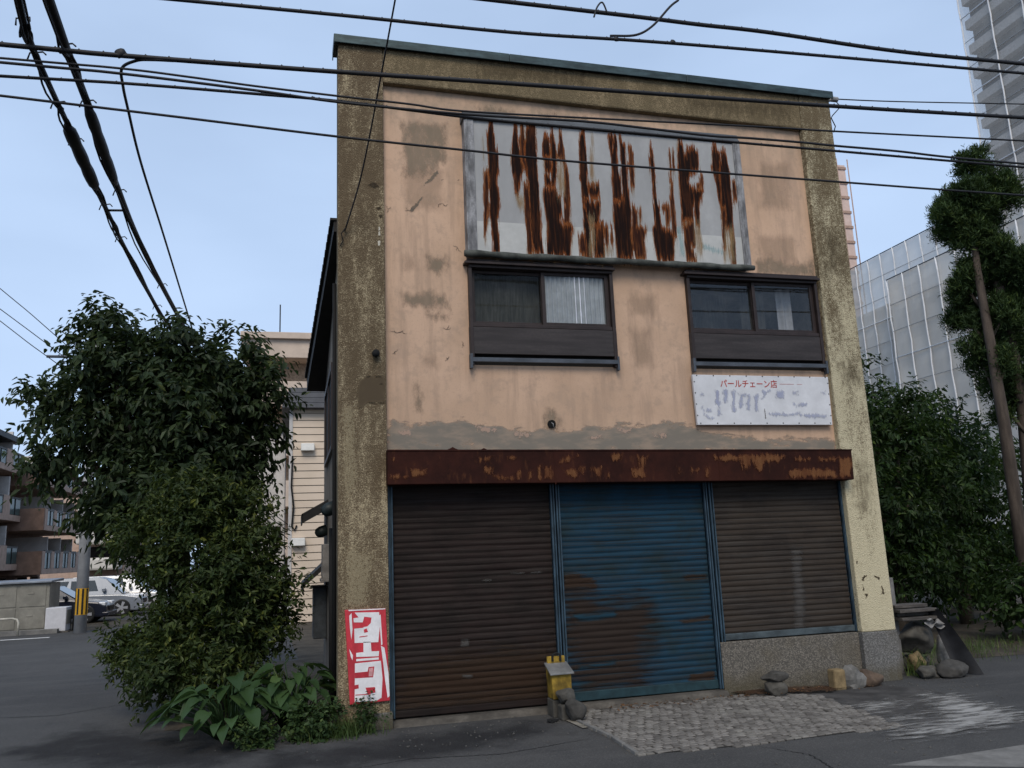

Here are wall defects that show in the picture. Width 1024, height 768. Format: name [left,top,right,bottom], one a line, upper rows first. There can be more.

leakage [403,124,445,175]
corrosion [483,121,737,266]
peeling [387,419,852,481]
corrosion [555,574,658,689]